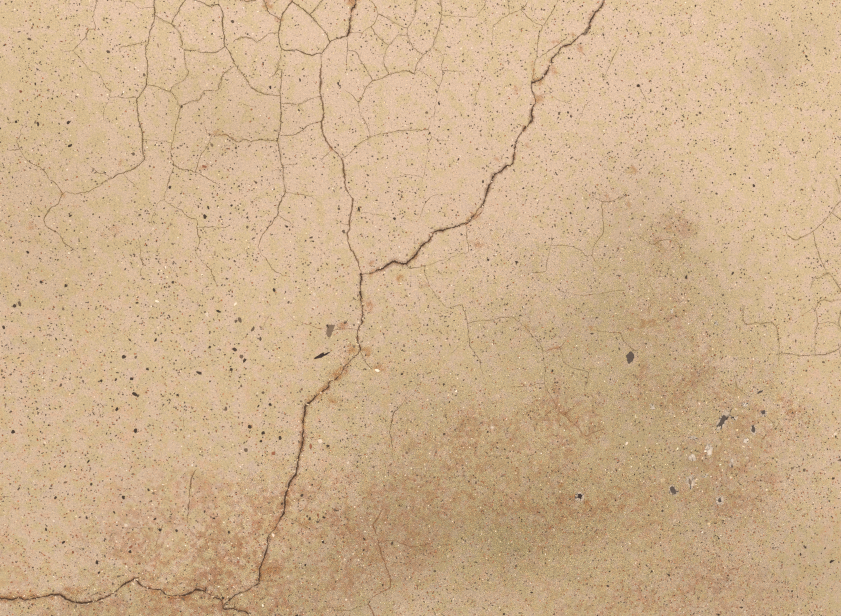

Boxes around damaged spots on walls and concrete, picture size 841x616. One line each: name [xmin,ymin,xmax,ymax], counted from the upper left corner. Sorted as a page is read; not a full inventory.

crack [0,0,608,616]
crack [538,195,629,273]
crack [742,178,841,359]